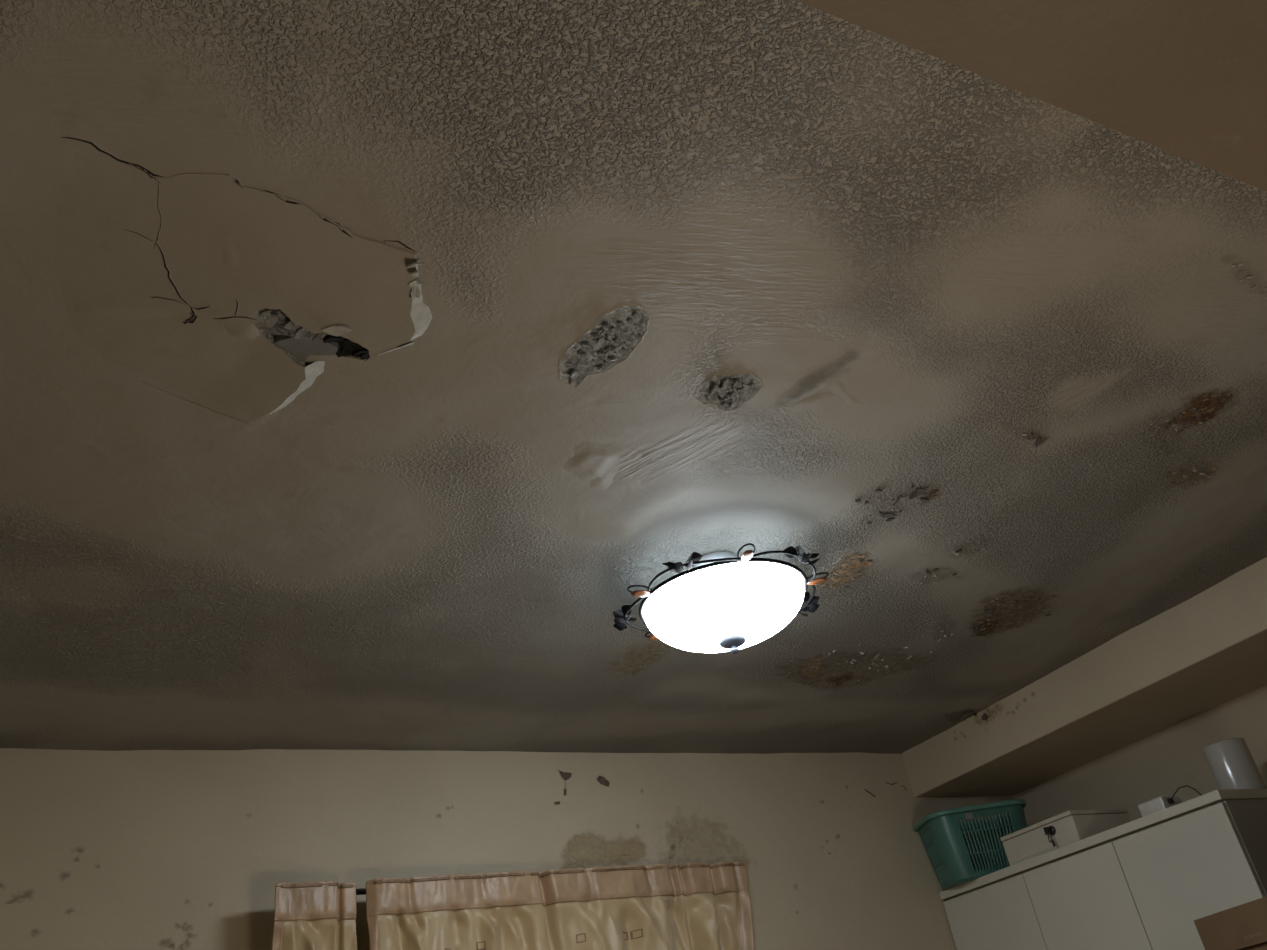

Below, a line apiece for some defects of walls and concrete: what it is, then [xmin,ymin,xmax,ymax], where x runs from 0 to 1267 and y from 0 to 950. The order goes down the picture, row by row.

crack [61,136,257,324]
crack [227,174,353,238]
crack [383,239,417,252]
spalling [256,308,370,366]
spalling [558,304,651,388]
spalling [693,372,764,412]
peeling [855,485,939,525]